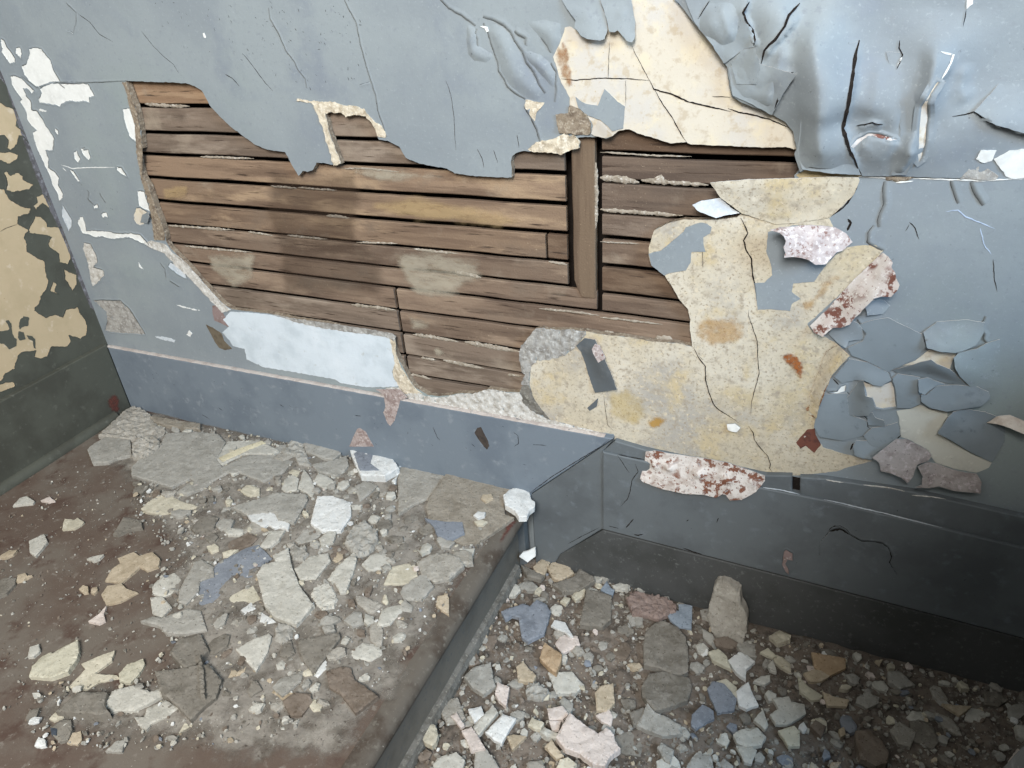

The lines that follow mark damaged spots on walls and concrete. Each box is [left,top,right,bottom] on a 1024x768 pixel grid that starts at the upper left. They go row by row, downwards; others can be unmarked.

flaking render [0,0,1005,476]
crack [440,0,789,166]
crack [742,3,800,63]
crack [832,40,919,251]
crack [694,219,771,470]
crack [819,525,901,575]